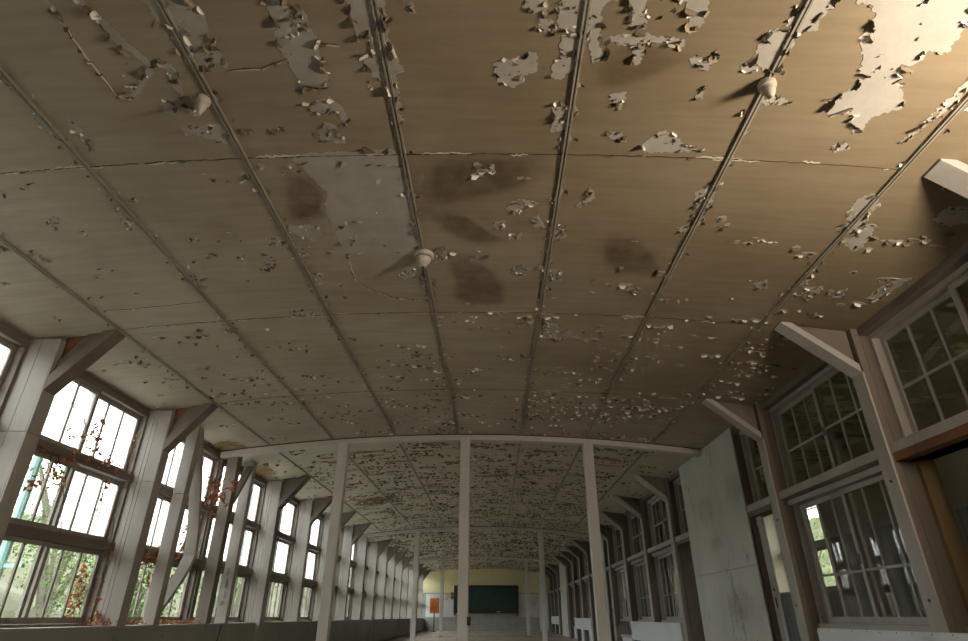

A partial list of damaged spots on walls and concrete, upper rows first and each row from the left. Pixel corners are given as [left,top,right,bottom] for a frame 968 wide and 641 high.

peeling [73,0,254,144]
peeling [493,51,538,88]
peeling [740,0,841,75]
peeling [821,0,968,153]
peeling [258,0,457,300]
peeling [470,162,496,180]
crack [103,254,750,330]
peeling [197,199,912,572]